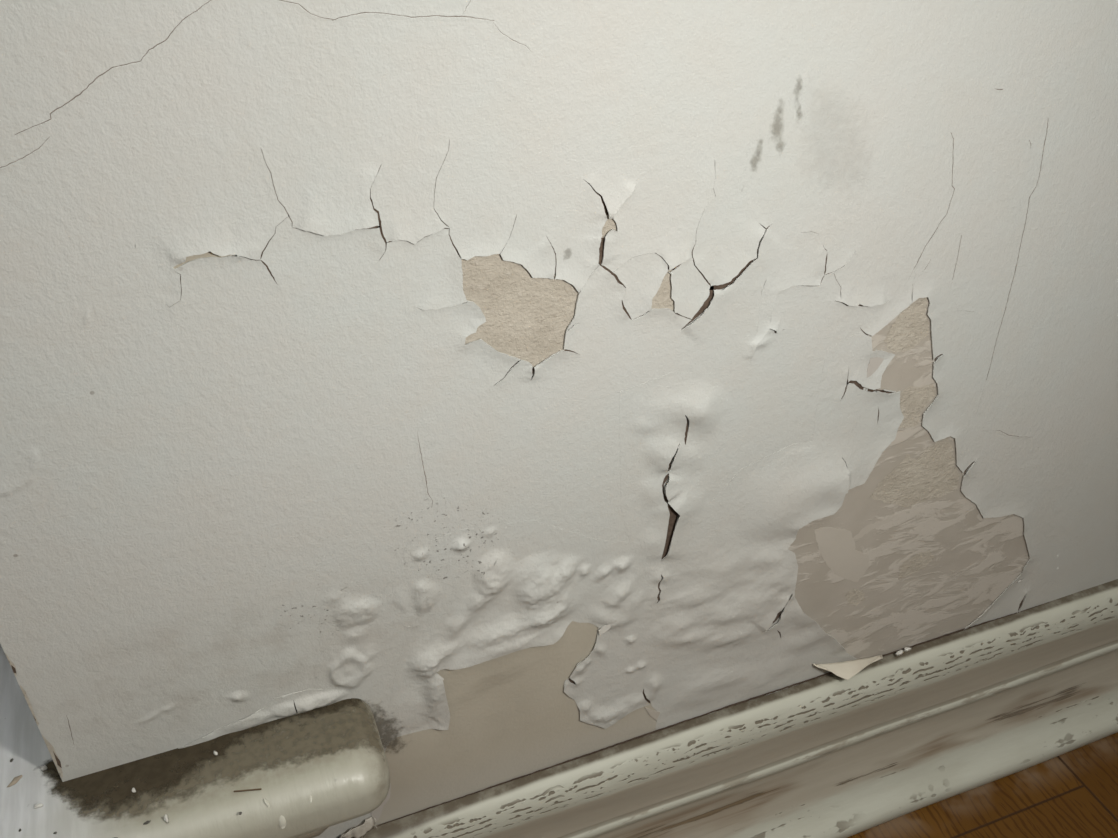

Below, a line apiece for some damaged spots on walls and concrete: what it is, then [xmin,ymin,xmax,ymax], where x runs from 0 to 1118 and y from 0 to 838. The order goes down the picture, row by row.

crack [0,0,221,173]
crack [263,0,533,53]
spalling [387,107,614,421]
crack [537,128,881,393]
crack [904,133,974,314]
crack [975,119,1049,439]
spalling [760,270,1059,680]
peeling [988,685,1079,722]
peeling [340,817,377,838]
peeling [638,788,778,838]